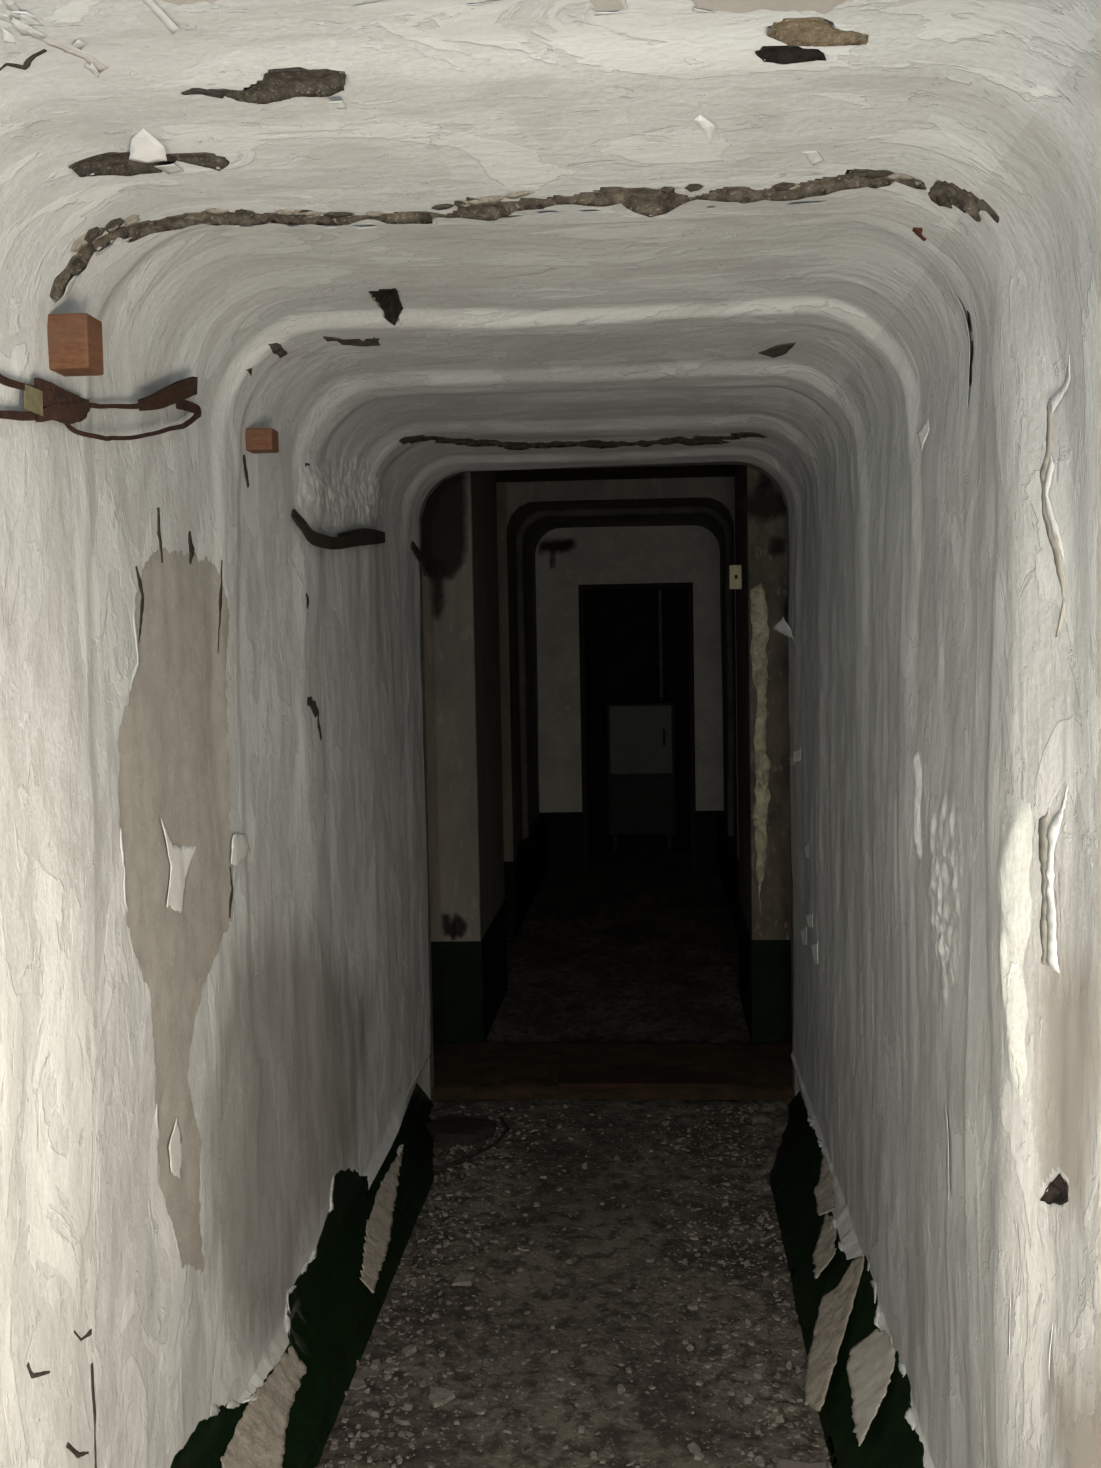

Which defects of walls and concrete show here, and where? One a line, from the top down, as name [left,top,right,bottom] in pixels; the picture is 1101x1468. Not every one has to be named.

peeling [0,0,109,78]
spalling [69,128,230,177]
spalling [181,67,347,109]
peeling [590,0,628,16]
spalling [690,0,869,65]
crack [49,169,999,303]
peeling [1040,355,1070,637]
peeling [1038,785,1068,974]
peeling [170,1088,434,1468]
peeling [772,1093,924,1468]